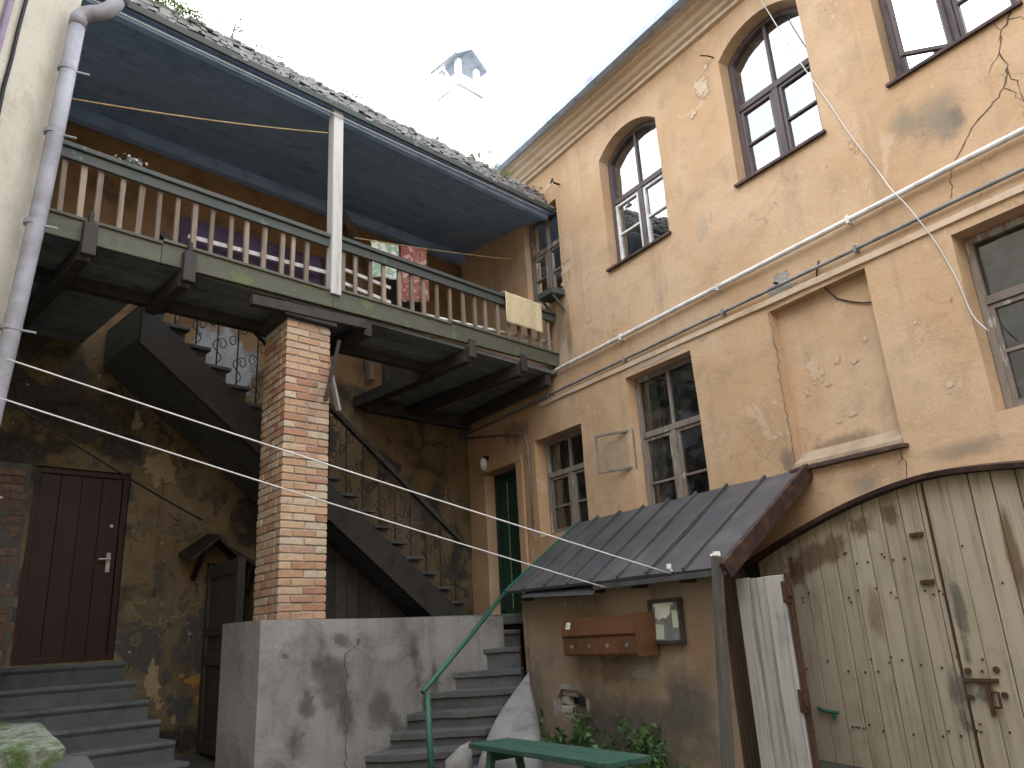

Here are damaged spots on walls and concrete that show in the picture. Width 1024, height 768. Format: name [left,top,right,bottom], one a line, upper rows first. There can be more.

flaking render [692,63,710,100]
crack [949,11,1024,197]
leakage [0,428,54,487]
leakage [97,436,143,460]
crack [768,313,795,464]
flaking render [0,461,33,669]
crack [342,646,359,768]
spalling [553,683,590,719]